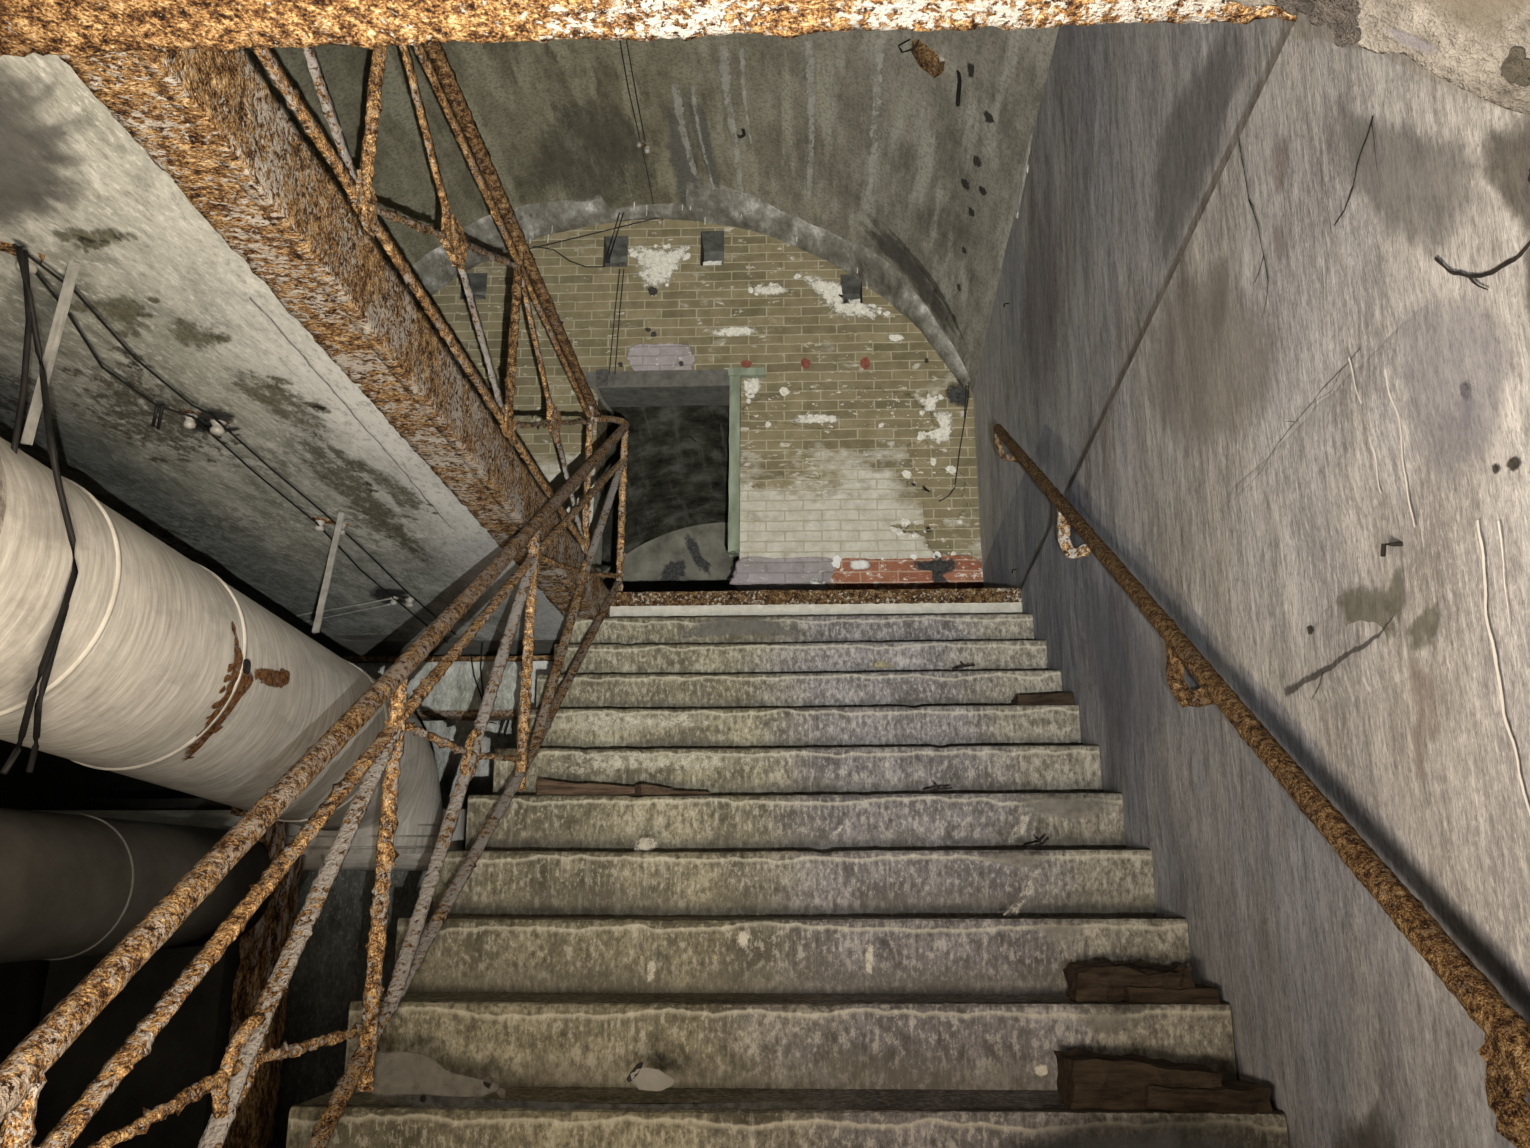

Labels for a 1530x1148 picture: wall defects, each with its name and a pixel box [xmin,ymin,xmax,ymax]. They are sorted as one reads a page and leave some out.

spalling [1275,0,1361,48]
damp [668,46,752,203]
crack [1334,115,1381,226]
damp [1488,126,1530,231]
damp [168,319,233,348]
peeling [400,215,508,307]
peeling [513,182,971,390]
crack [1434,241,1530,290]
damp [190,409,239,433]
damp [232,370,434,561]
peeling [729,357,984,591]
crack [1284,615,1394,699]